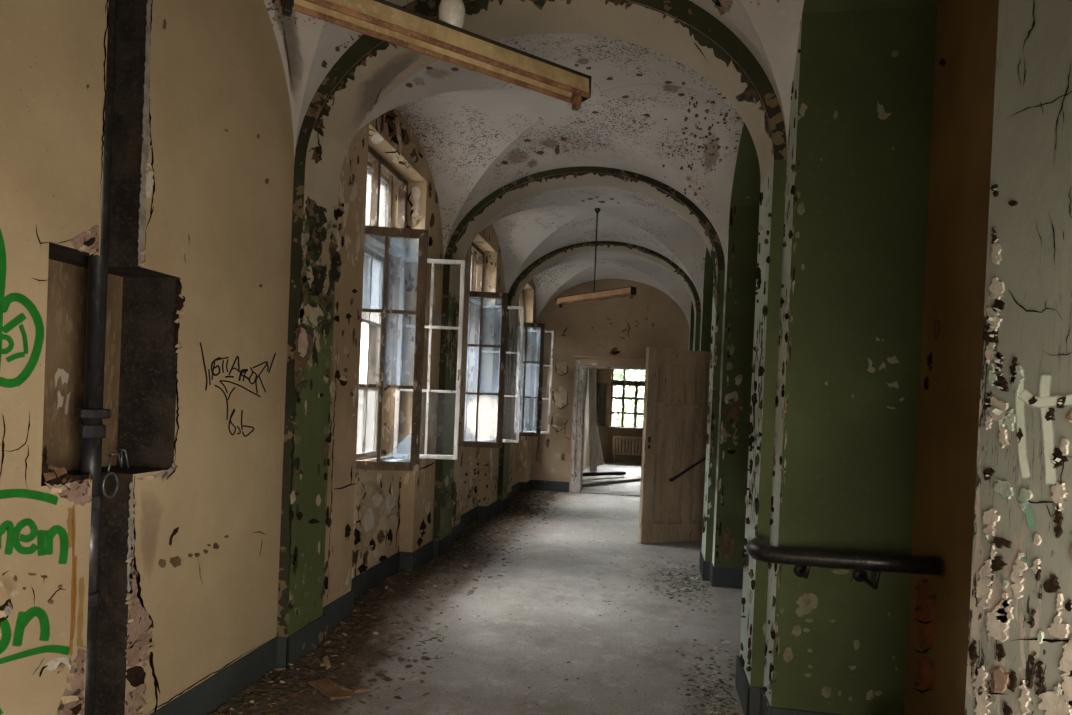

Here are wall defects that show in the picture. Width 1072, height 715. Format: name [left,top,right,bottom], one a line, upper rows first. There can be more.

crack [1006,0,1072,154]
crack [144,91,155,265]
crack [1036,188,1072,264]
peeling [290,196,358,528]
peeling [451,0,818,700]
peeling [983,278,1038,448]
crack [1009,291,1072,356]
spalling [42,445,93,506]
spalling [124,280,185,715]
peeling [1050,438,1070,469]
spalling [40,646,86,715]
peeling [968,508,1072,715]